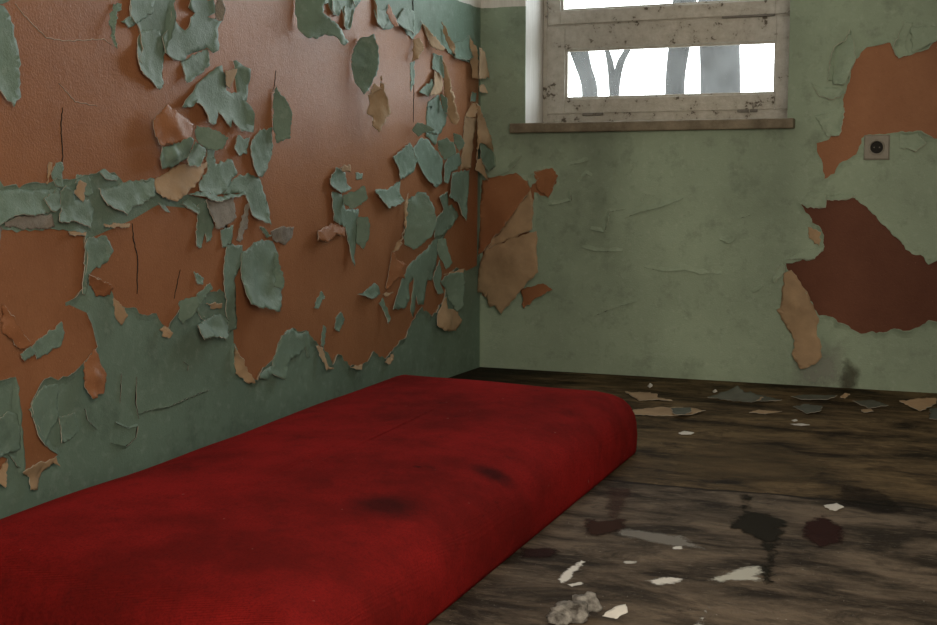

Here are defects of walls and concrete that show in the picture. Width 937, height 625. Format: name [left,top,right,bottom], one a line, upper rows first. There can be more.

peeling [0,0,561,490]
peeling [772,22,937,369]